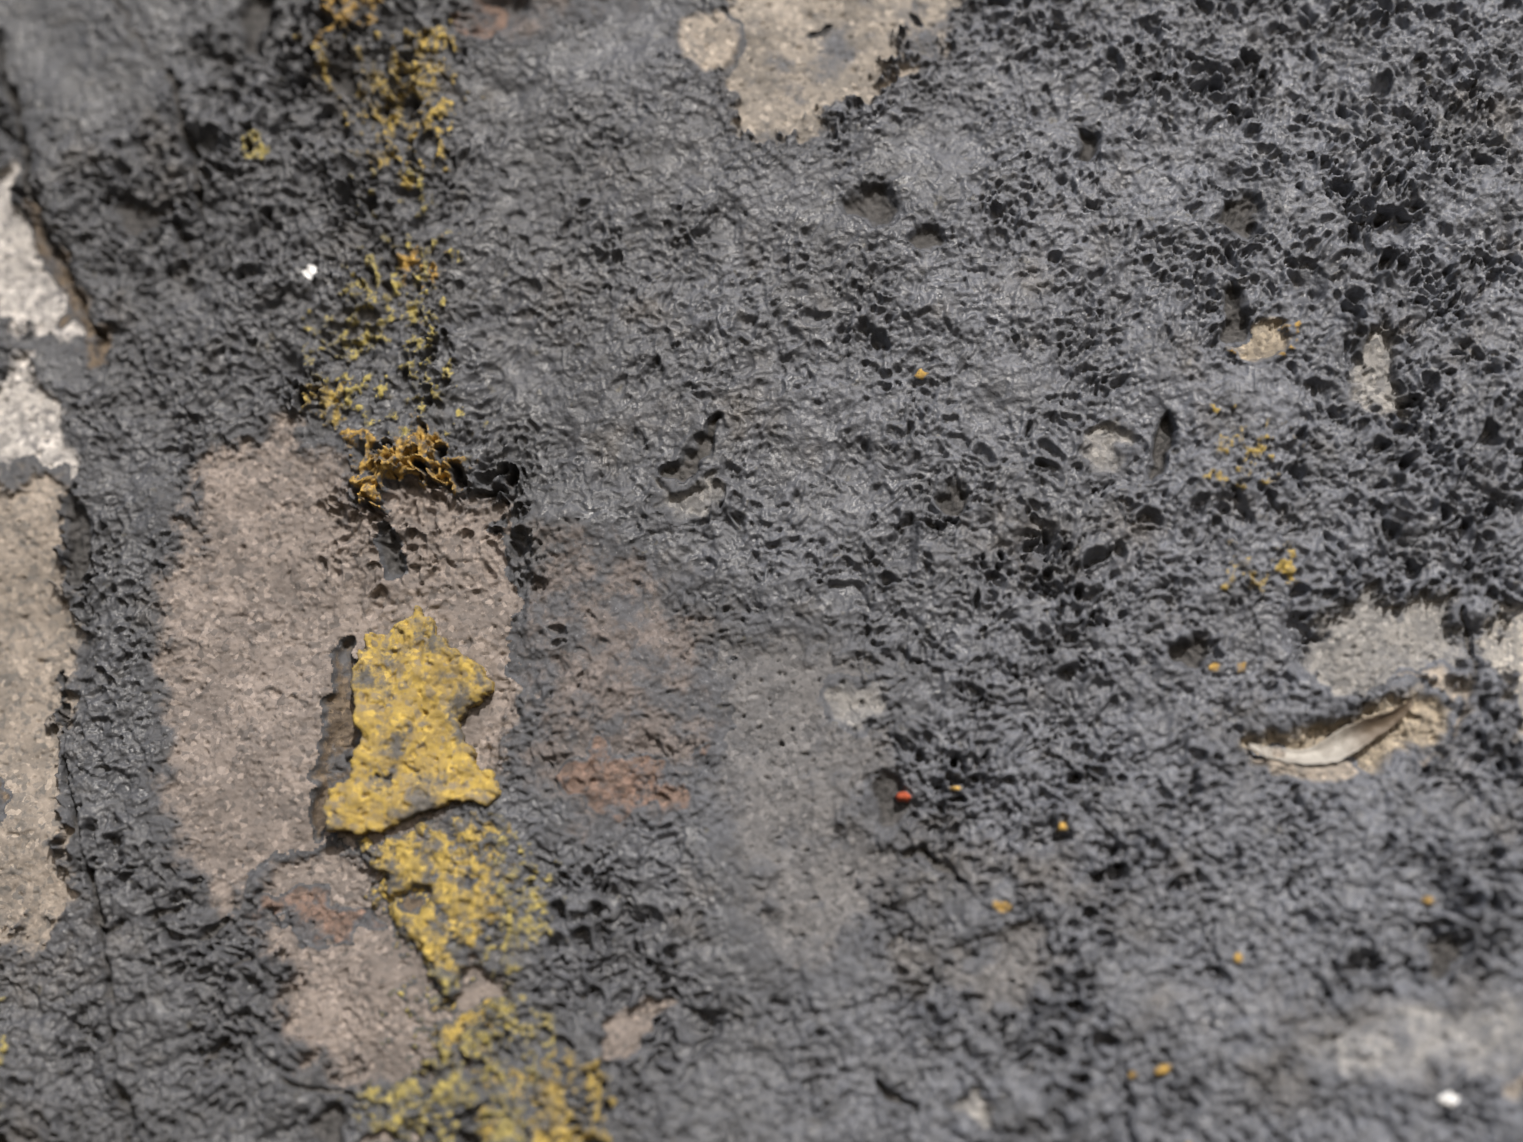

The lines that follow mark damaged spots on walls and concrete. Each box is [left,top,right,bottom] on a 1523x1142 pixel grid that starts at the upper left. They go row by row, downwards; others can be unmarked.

crack [0,28,58,246]
spalling [671,0,982,162]
spalling [0,136,104,978]
spalling [121,397,542,1142]
spalling [1229,570,1523,789]
crack [52,669,185,1142]
spalling [1276,927,1523,1112]